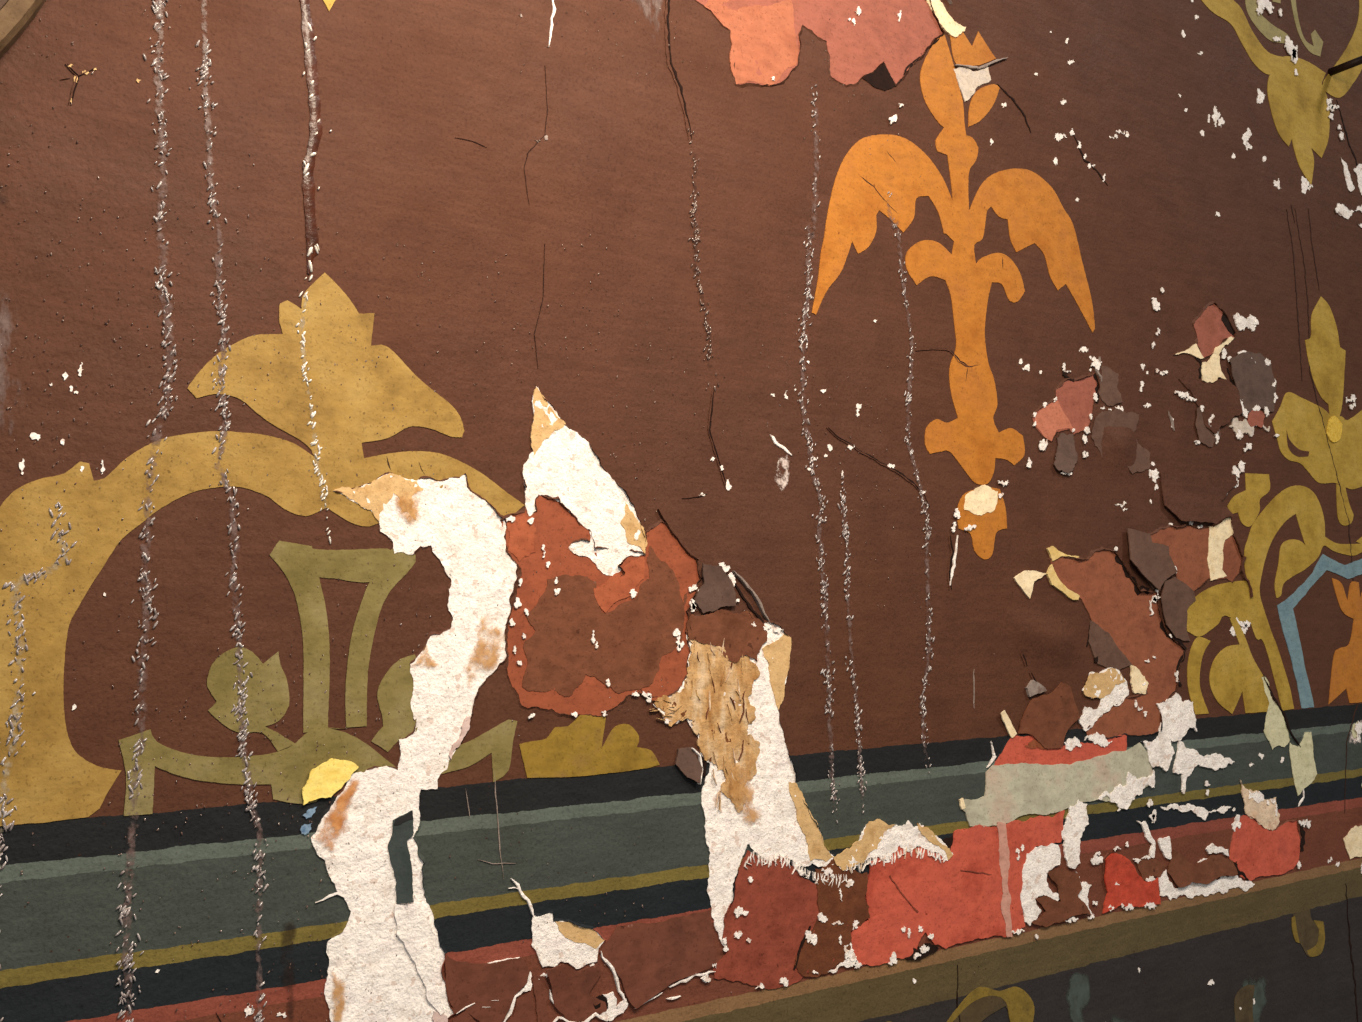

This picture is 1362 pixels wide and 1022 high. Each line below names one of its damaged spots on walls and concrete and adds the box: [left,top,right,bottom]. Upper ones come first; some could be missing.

crack [519,0,556,202]
crack [664,0,692,140]
peeling [695,0,966,91]
peeling [954,57,1031,133]
peeling [1326,98,1362,229]
water stain [127,0,178,803]
water stain [196,38,268,1022]
water stain [794,84,867,824]
water stain [890,217,935,774]
peeling [300,301,1317,1022]
water stain [115,827,144,1022]
peeling [1328,823,1362,874]